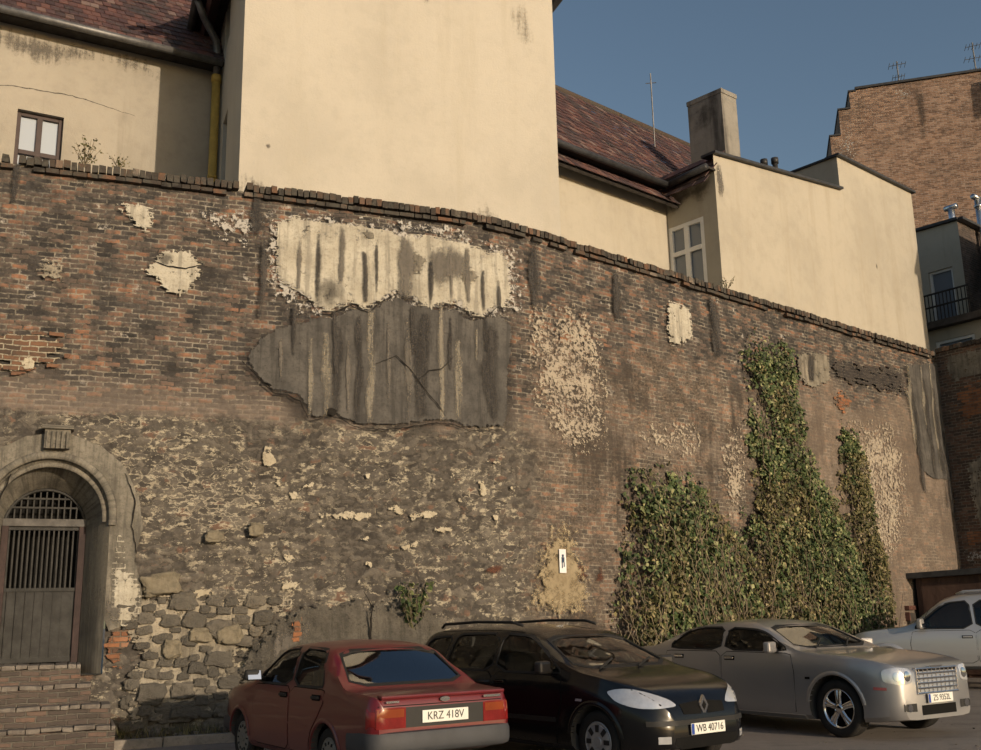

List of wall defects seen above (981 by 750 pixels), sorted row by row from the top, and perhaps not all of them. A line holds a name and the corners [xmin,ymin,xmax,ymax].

water stain [0,33,93,61]
crack [0,85,134,116]
peeling [266,208,527,320]
crack [242,355,502,432]
spalling [248,522,264,537]
spalling [104,589,295,733]